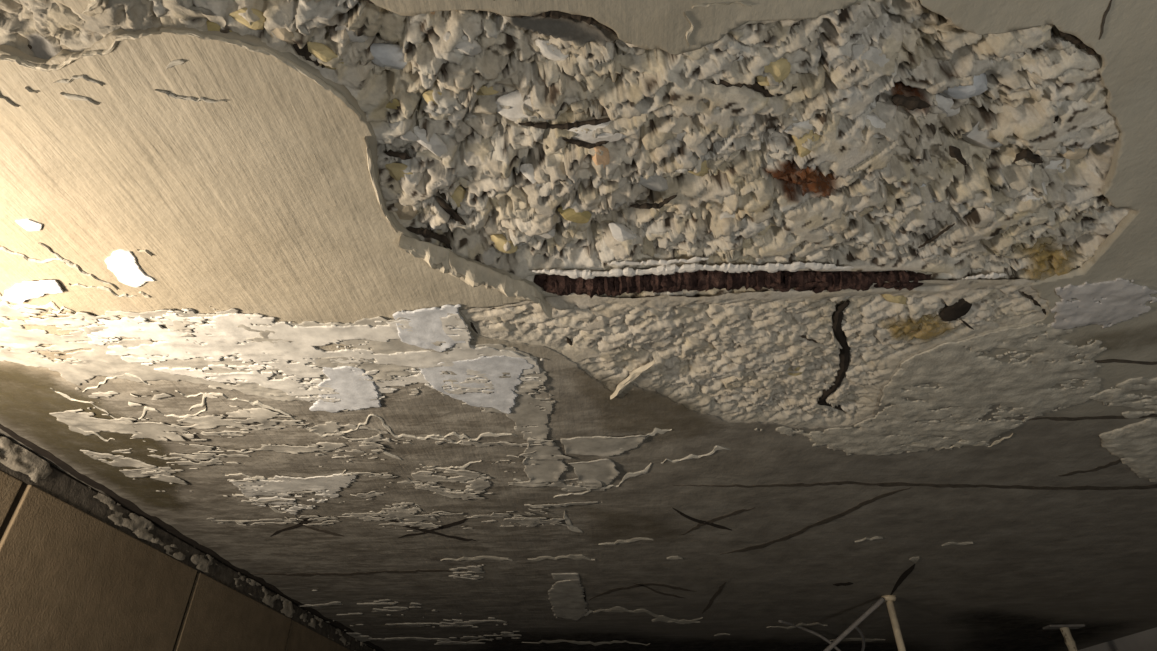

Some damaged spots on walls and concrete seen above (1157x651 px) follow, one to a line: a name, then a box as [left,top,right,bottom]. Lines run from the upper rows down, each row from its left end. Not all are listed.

rust [766,160,835,201]
spalling [0,0,1157,497]
crack [817,300,851,412]
water stain [0,368,182,508]
peeling [207,460,602,533]
crack [0,424,476,651]
peeling [449,564,485,580]
water stain [528,554,595,562]
water stain [598,537,654,545]
crack [580,459,1157,614]
peeling [298,590,522,645]
water stain [589,606,703,624]